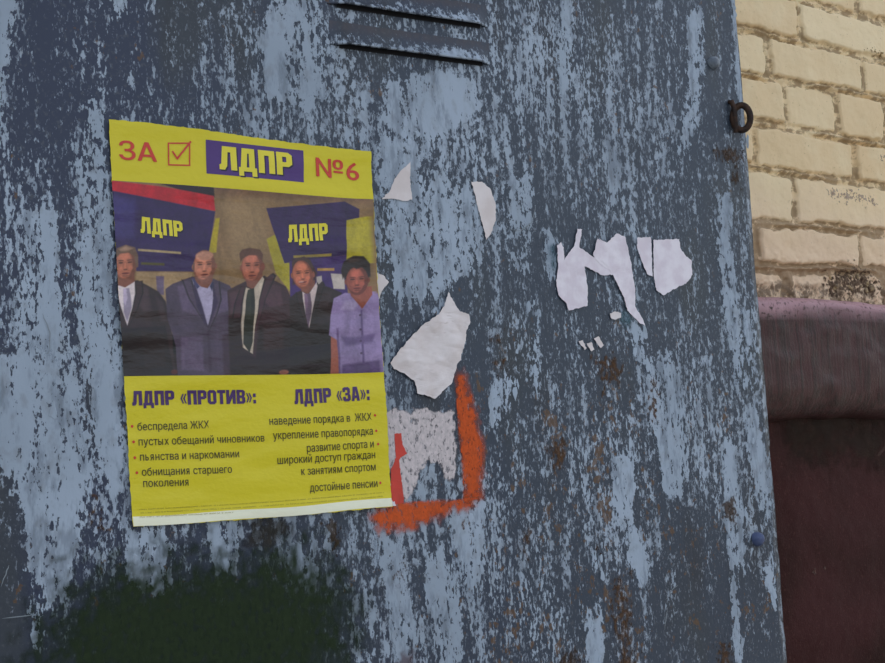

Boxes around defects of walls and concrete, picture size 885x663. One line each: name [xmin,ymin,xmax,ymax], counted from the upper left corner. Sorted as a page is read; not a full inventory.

peeling [254,0,334,117]
peeling [368,65,484,311]
corrosion [713,145,745,191]
peeling [0,94,129,652]
corrosion [544,437,570,472]
corrosion [590,351,624,418]
corrosion [647,376,660,423]
peeling [626,318,690,502]
corrosion [722,493,739,525]
peeling [714,191,774,663]
peeling [375,497,493,663]
corrosion [608,570,642,663]